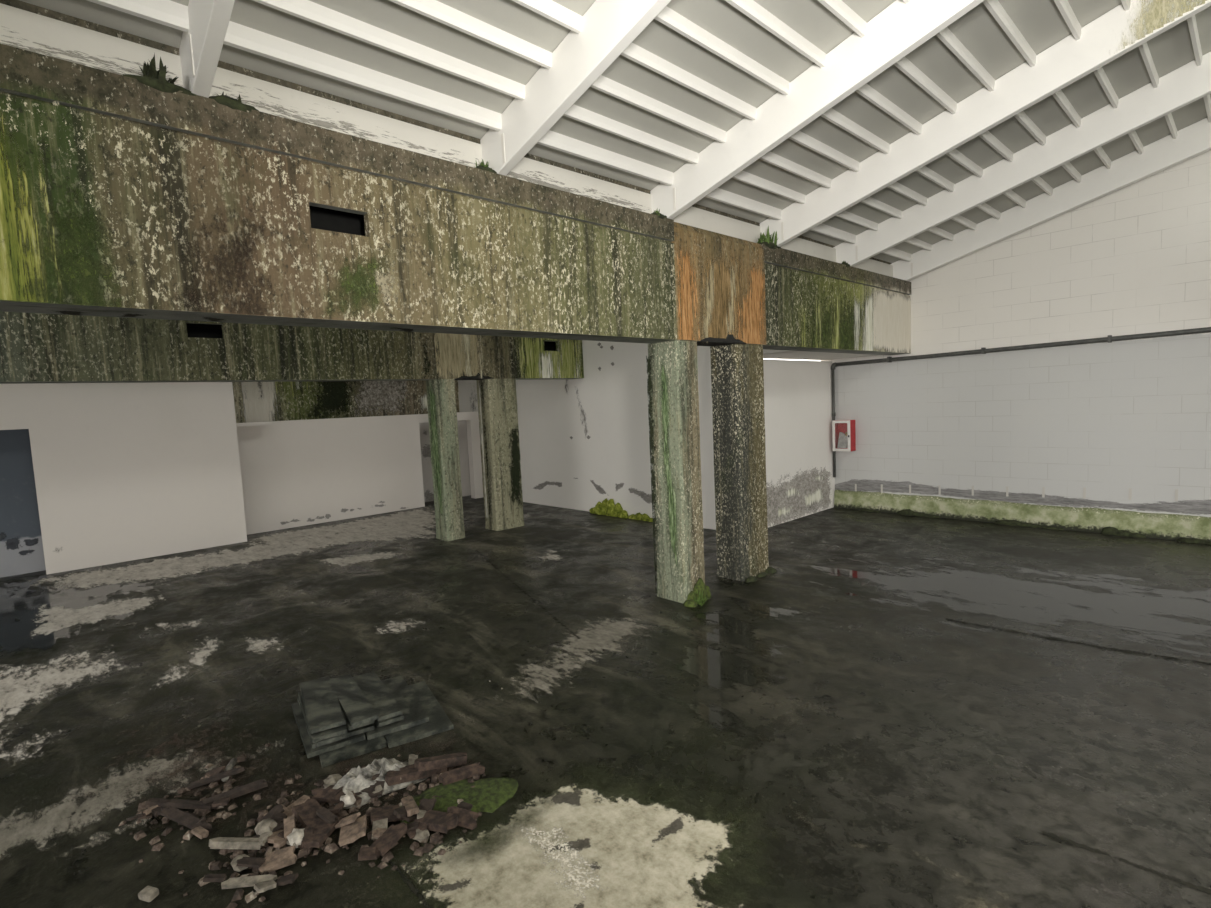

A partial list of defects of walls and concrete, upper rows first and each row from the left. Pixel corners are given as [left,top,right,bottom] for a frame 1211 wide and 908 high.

leakage [0,95,116,207]
leakage [375,262,401,303]
corrosion [677,250,765,344]
peeling [533,478,652,504]
peeling [766,466,1211,527]
peeling [0,532,38,556]
leakage [403,778,754,908]